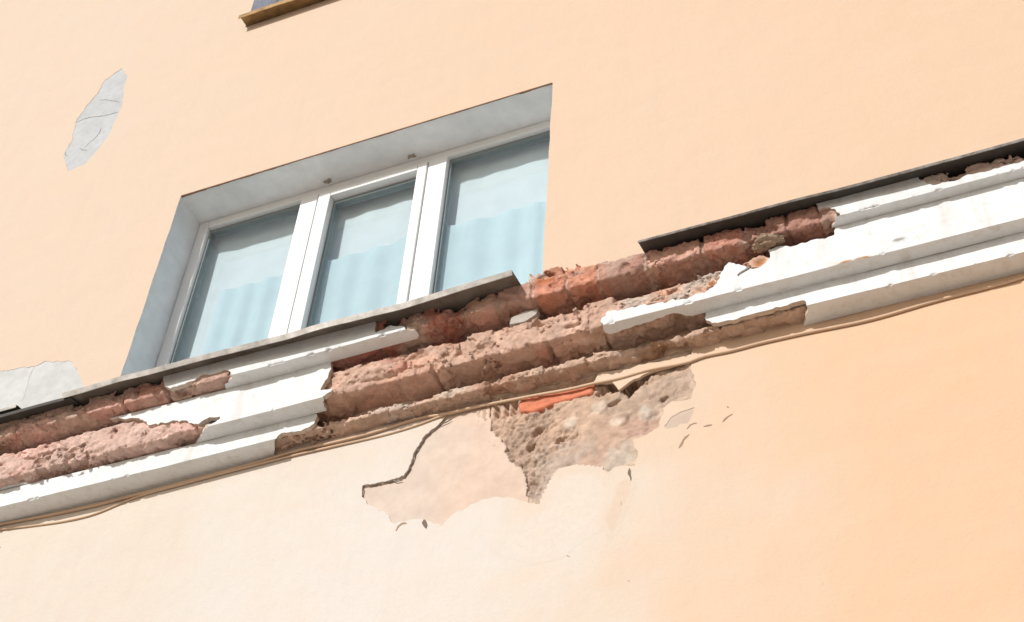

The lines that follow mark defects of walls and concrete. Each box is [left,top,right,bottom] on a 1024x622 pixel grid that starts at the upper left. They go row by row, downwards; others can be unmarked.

peeling [64,69,127,171]
flaking render [0,361,231,491]
flaking render [363,350,704,528]